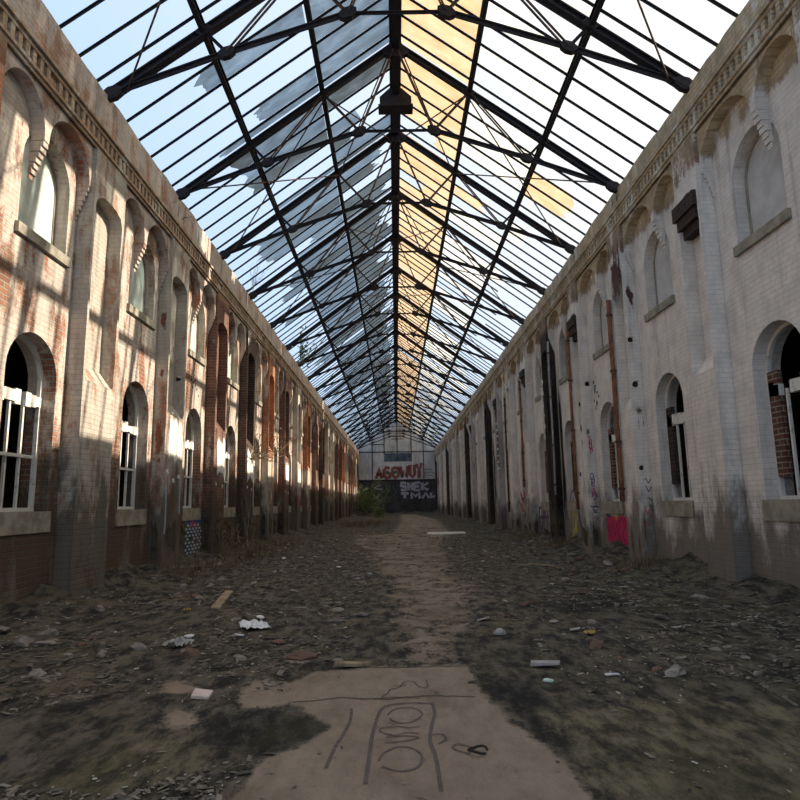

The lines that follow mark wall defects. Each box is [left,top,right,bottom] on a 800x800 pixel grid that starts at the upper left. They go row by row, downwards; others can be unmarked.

peeling [215,439,225,489]
peeling [285,463,301,494]